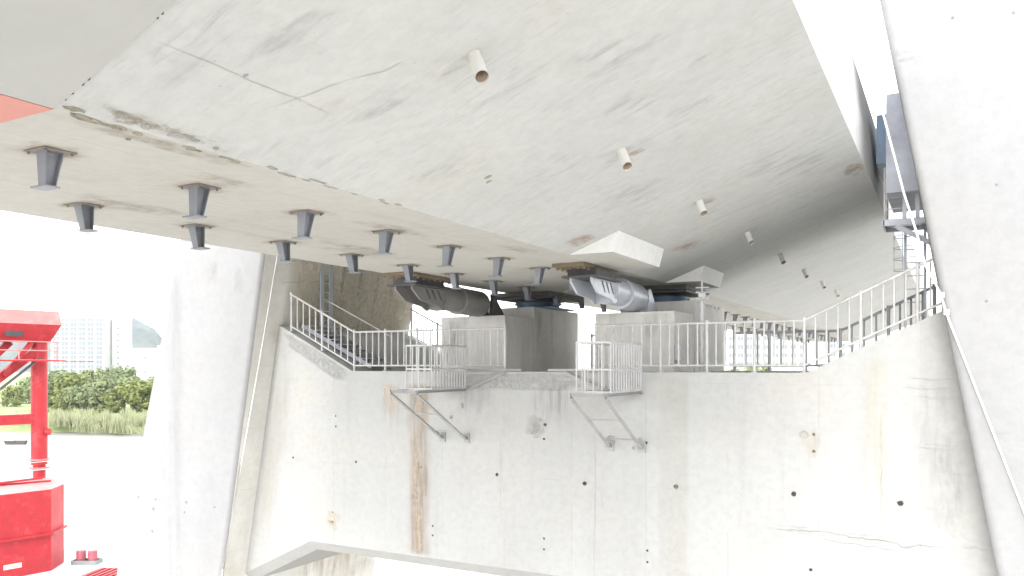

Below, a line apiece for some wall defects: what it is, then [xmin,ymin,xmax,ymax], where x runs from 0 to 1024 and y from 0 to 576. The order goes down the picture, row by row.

crack [156,12,399,111]
spalling [62,106,154,141]
spalling [167,133,241,164]